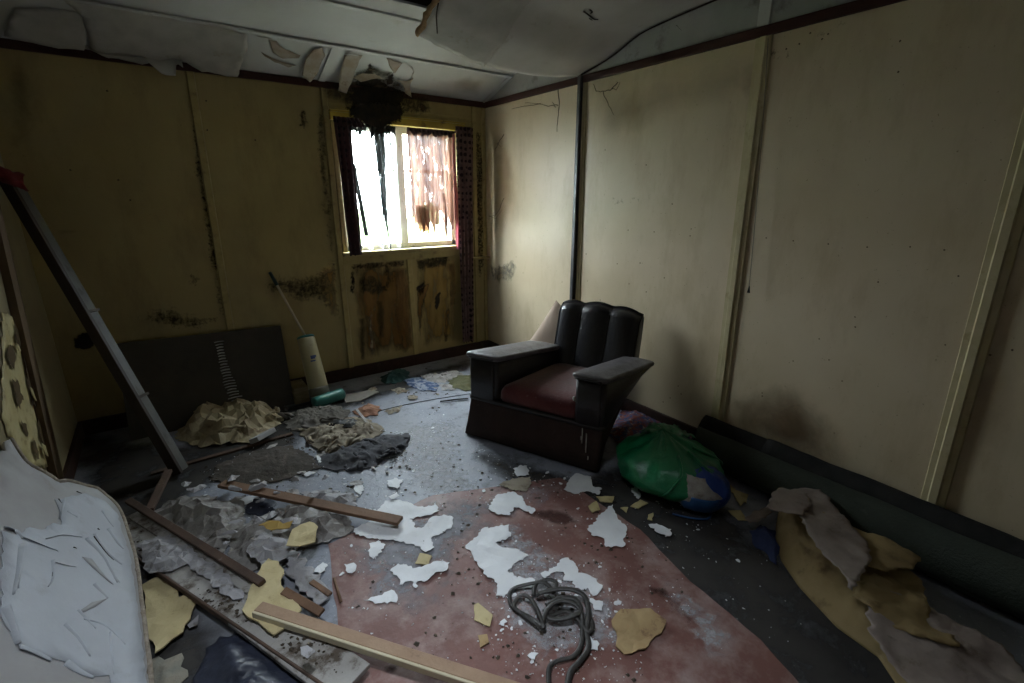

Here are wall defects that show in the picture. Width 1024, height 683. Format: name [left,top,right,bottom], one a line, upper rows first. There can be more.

crack [513,90,560,125]
crack [581,0,717,113]
water stain [350,257,455,357]
peeling [1,312,155,683]